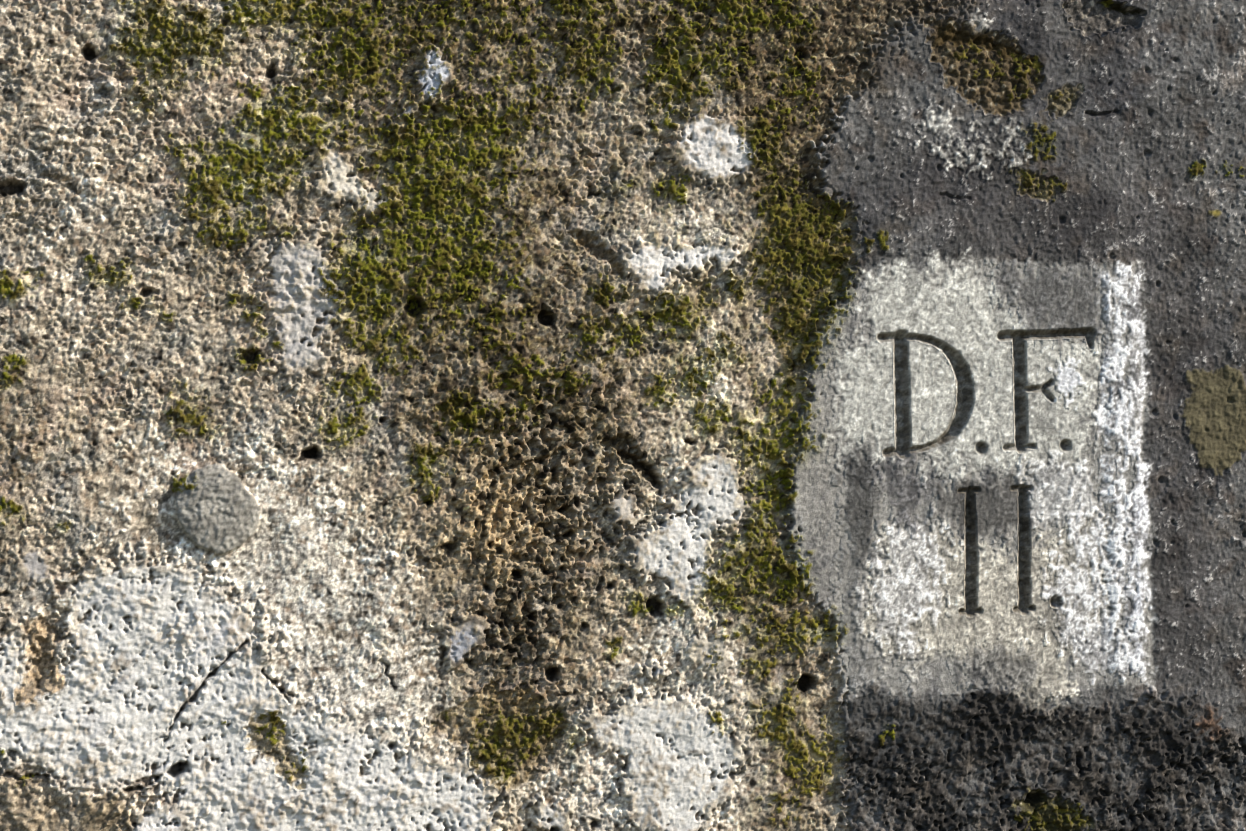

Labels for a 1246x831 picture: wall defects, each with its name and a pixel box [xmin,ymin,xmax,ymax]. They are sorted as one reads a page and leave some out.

crack [123,640,296,794]